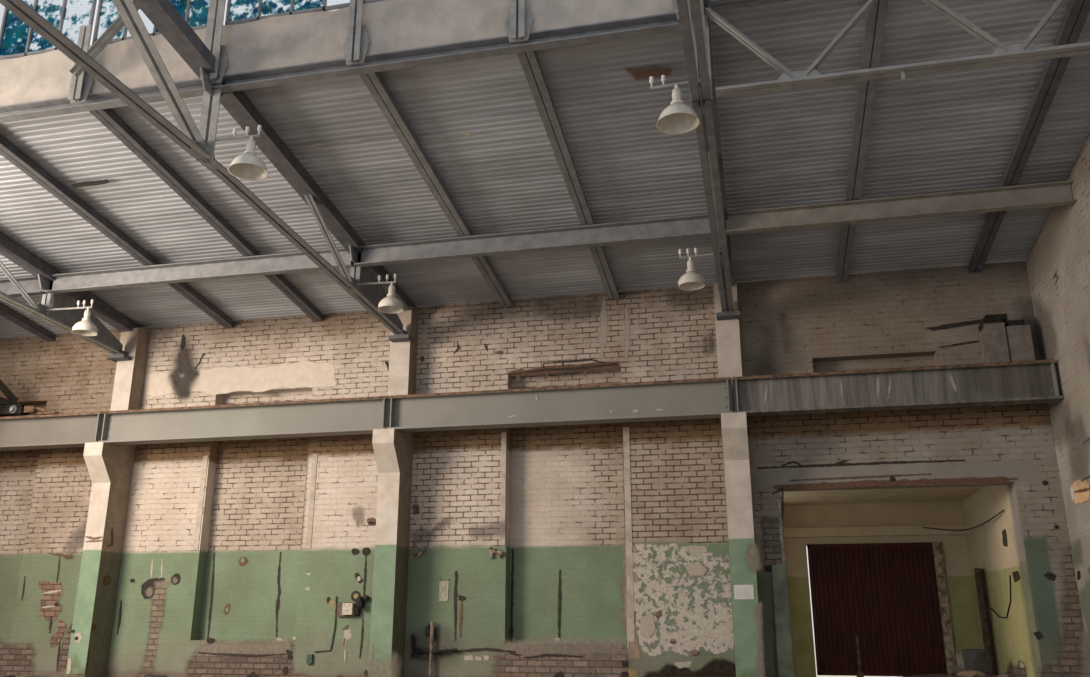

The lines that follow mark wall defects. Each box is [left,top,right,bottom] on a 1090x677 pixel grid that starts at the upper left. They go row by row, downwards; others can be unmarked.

corrosion [626,67,671,80]
flaking render [0,644,34,677]
spalling [38,581,84,677]
crack [207,553,215,638]
flaking render [187,637,309,677]
crack [274,552,282,641]
peeling [343,625,352,660]
crack [507,549,515,642]
crack [554,570,562,642]
peeling [463,543,734,677]
flaking render [1007,543,1090,677]